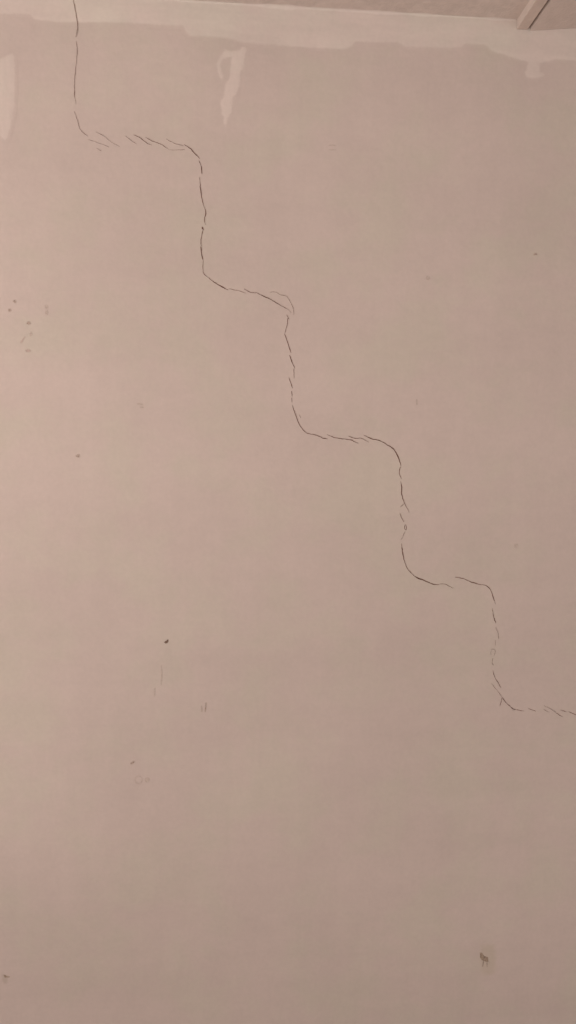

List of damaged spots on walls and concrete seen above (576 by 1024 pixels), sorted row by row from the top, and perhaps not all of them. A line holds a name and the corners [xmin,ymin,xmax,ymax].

crack [73,0,576,717]